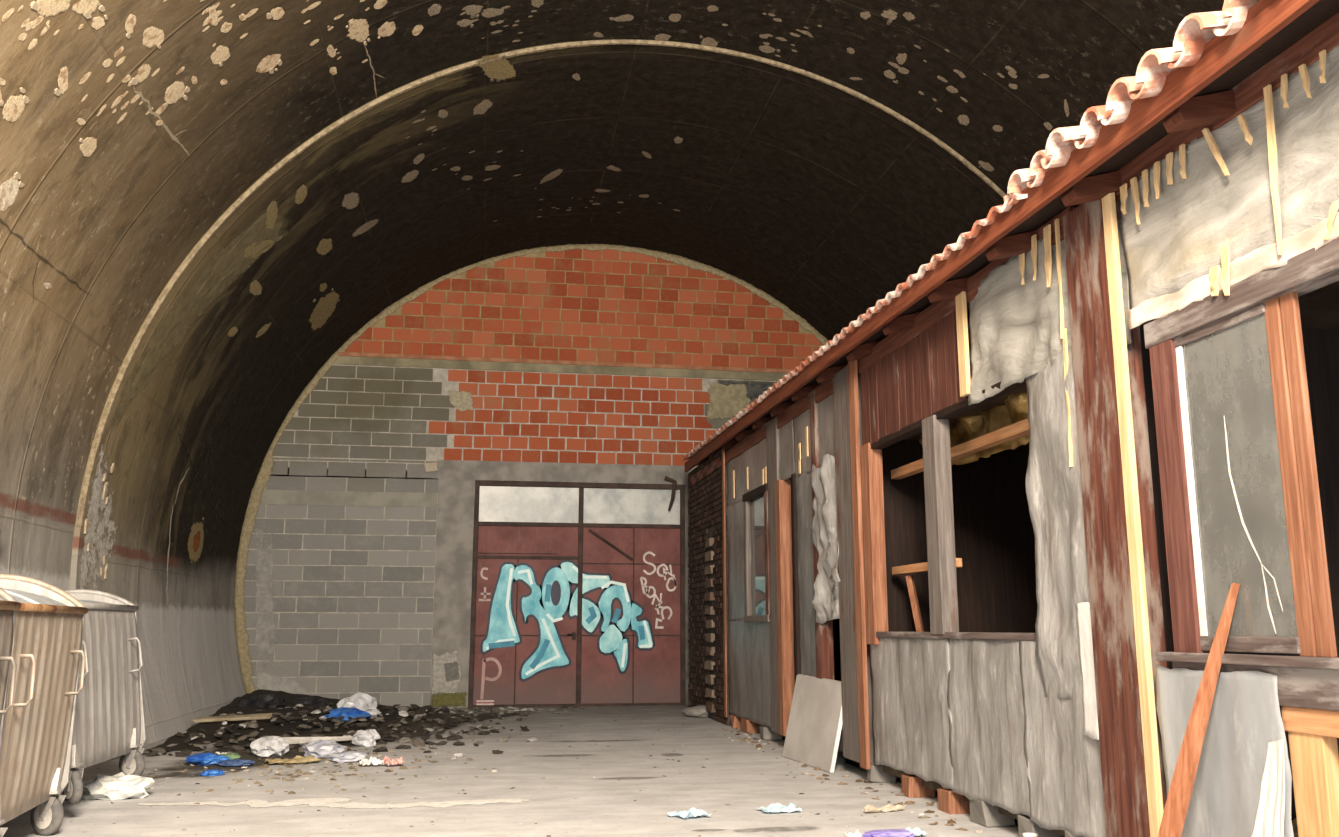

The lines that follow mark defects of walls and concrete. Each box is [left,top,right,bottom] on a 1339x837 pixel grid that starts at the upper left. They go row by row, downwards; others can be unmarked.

spalling [2,0,108,50]
spalling [457,0,544,82]
spalling [593,14,634,37]
peeling [759,13,822,57]
spalling [860,10,915,25]
peeling [54,14,197,157]
spalling [473,99,493,115]
spalling [401,109,521,190]
spalling [0,172,24,211]
spalling [342,192,359,209]
spalling [316,238,332,255]
spalling [309,283,340,331]